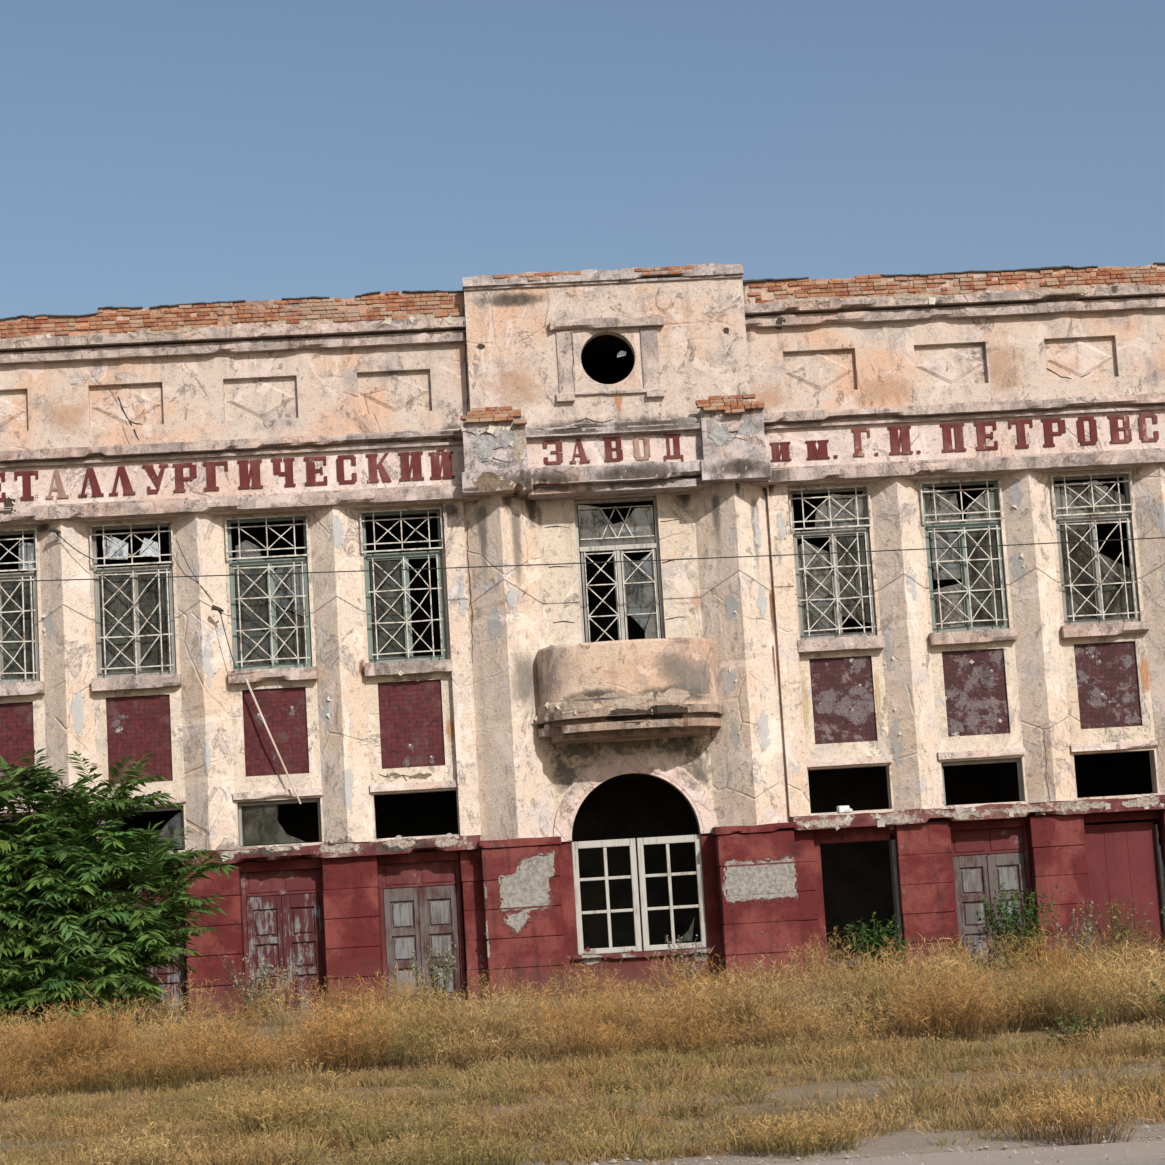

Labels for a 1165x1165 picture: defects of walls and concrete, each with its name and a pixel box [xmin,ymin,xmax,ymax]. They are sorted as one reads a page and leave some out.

crack [118,397,143,441]
peeling [814,656,877,726]
peeling [945,649,1006,736]
damp [554,730,708,789]
peeling [216,842,302,862]
peeling [380,835,416,849]
peeling [433,833,465,848]
peeling [804,814,852,830]
peeling [875,812,916,830]
peeling [936,793,1164,820]
peeling [484,847,557,936]
peeling [716,850,799,907]